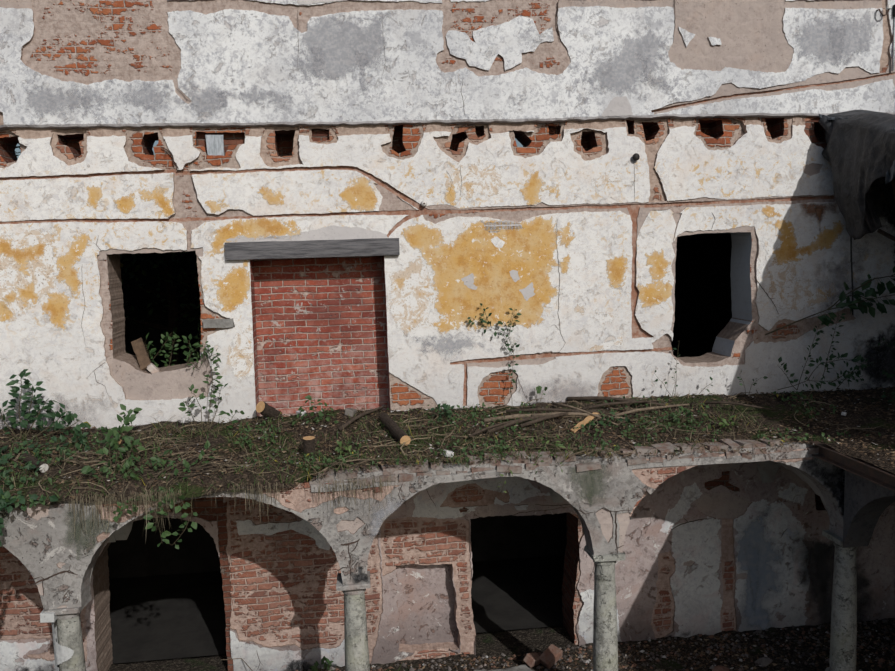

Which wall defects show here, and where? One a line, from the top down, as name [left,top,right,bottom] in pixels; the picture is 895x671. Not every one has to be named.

water stain [300,13,388,90]
flaking render [0,0,895,411]
flaking render [25,504,50,521]
flaking render [596,457,702,553]
flaking render [705,471,740,492]
flaking render [0,546,55,661]
flaking render [80,606,88,662]
flaking render [95,479,403,671]
flaking render [651,551,695,638]
flaking render [720,518,737,631]